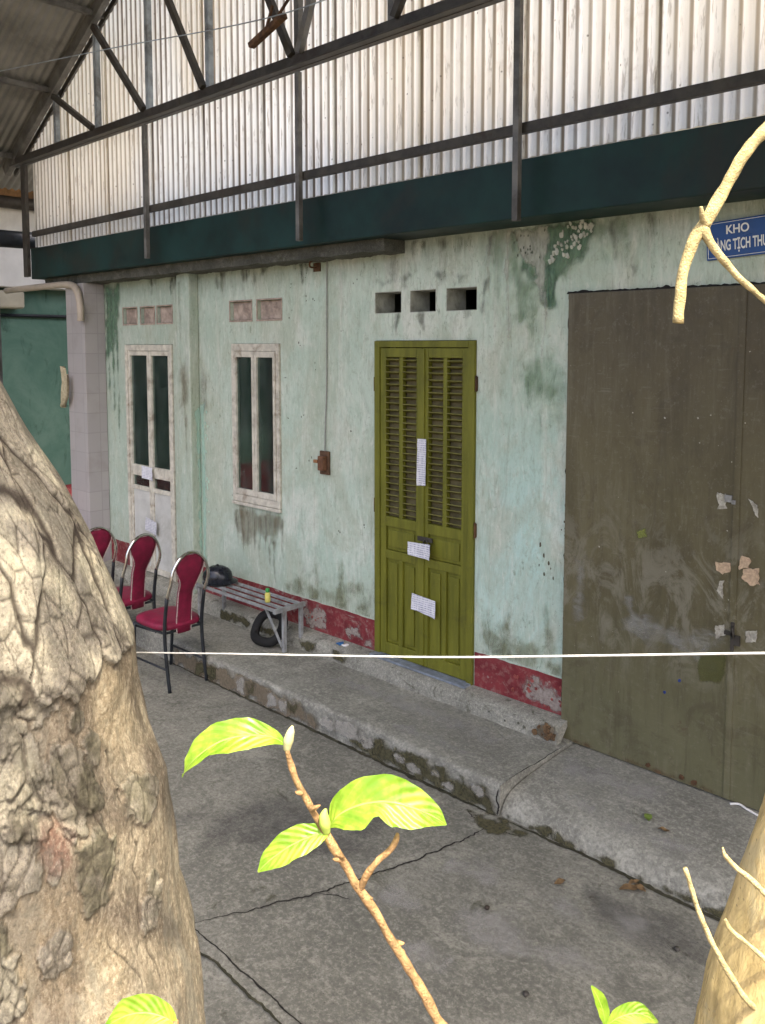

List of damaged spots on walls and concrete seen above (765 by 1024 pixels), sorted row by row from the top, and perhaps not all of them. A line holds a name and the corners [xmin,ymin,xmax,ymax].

damp [521,219,593,309]
peeling [303,605,326,629]
peeling [346,627,371,647]
peeling [511,674,562,711]
damp [372,738,445,783]
crack [195,749,558,1024]